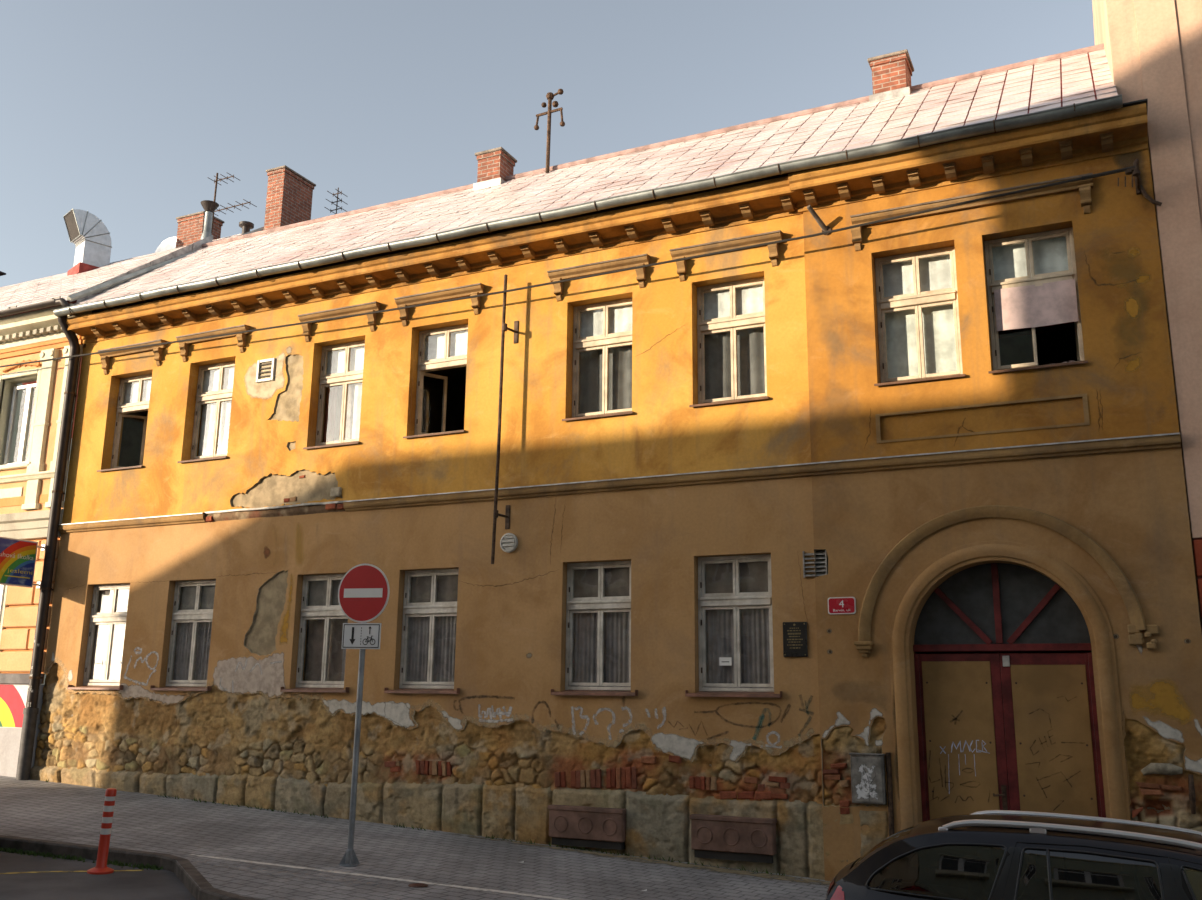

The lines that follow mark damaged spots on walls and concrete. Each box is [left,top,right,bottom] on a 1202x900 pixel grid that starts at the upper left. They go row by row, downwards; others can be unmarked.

peeling [245,347,304,422]
spalling [232,470,344,510]
spalling [34,571,887,814]
spalling [1124,711,1202,832]